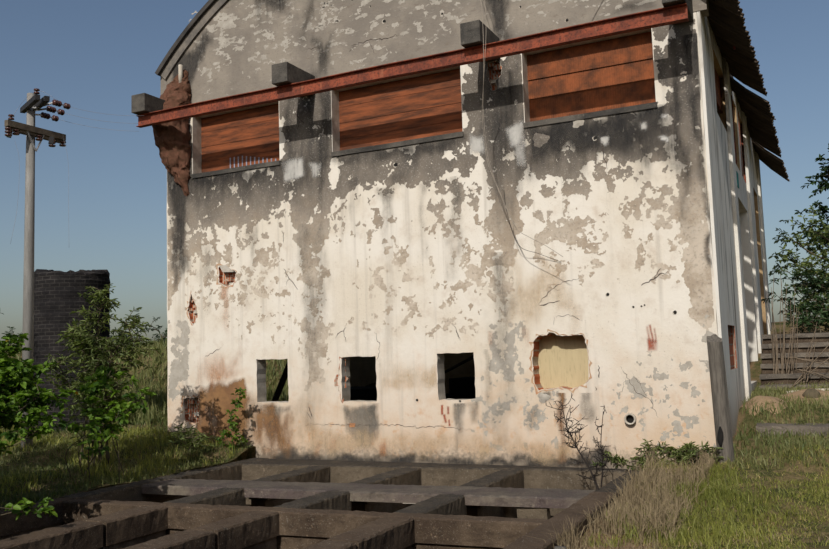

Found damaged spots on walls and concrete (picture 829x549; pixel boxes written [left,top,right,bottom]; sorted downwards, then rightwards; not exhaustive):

peeling [193,0,468,94]
leakage [683,33,701,136]
peeling [167,19,715,454]